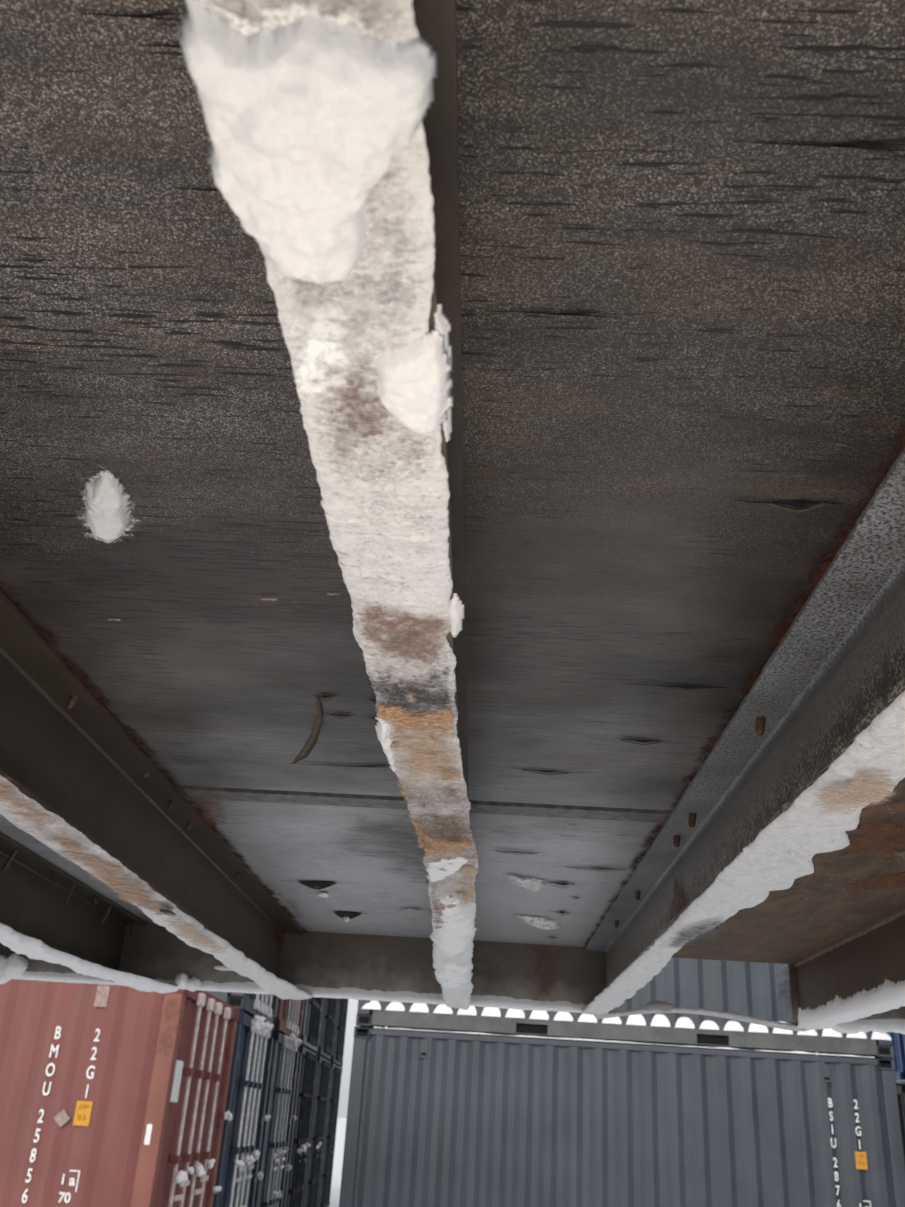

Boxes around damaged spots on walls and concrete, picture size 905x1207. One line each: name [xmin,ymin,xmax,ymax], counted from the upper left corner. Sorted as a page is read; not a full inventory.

rust [357,602,445,664]
rust [773,425,905,648]
rust [55,833,227,953]
rust [36,627,308,933]
rust [377,694,475,929]
rust [585,669,763,946]
rust [816,775,896,813]